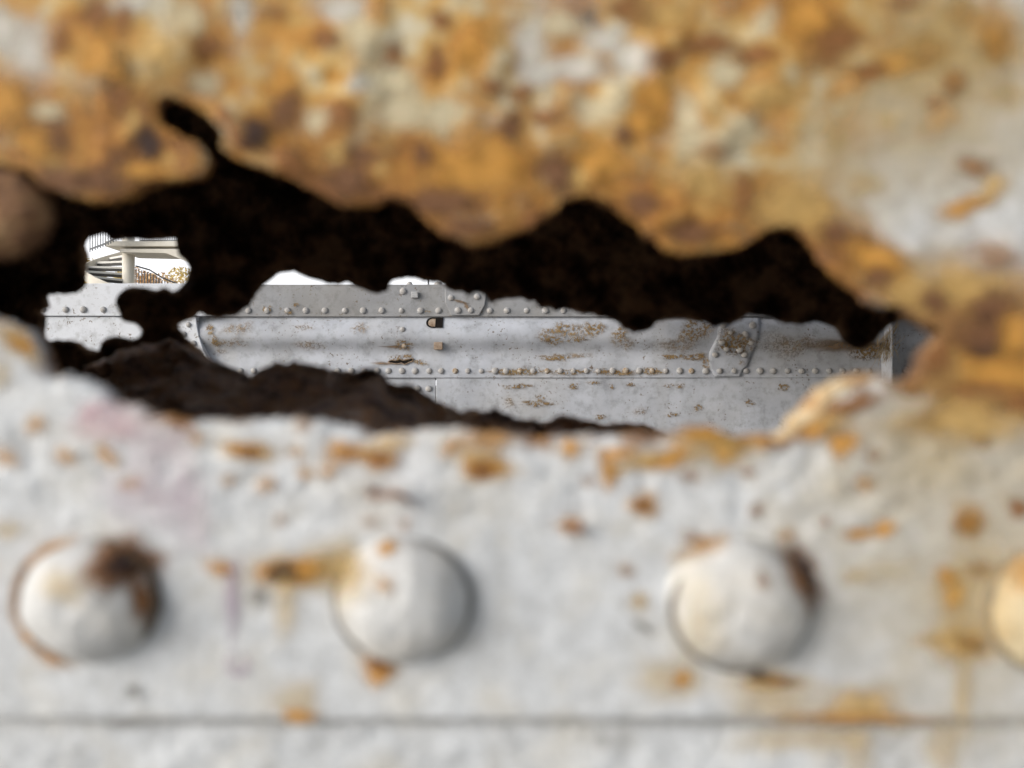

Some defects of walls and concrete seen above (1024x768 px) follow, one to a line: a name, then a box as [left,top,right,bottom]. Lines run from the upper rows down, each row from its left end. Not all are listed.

peeling [0,9,49,80]
peeling [321,0,457,130]
peeling [516,9,655,86]
peeling [306,111,328,134]
peeling [672,96,756,153]
corrosion [0,0,1024,445]
peeling [771,373,875,441]
corrosion [328,436,404,469]
corrosion [463,451,504,480]
corrosion [584,428,736,489]
corrosion [10,541,62,664]
corrosion [85,538,162,639]